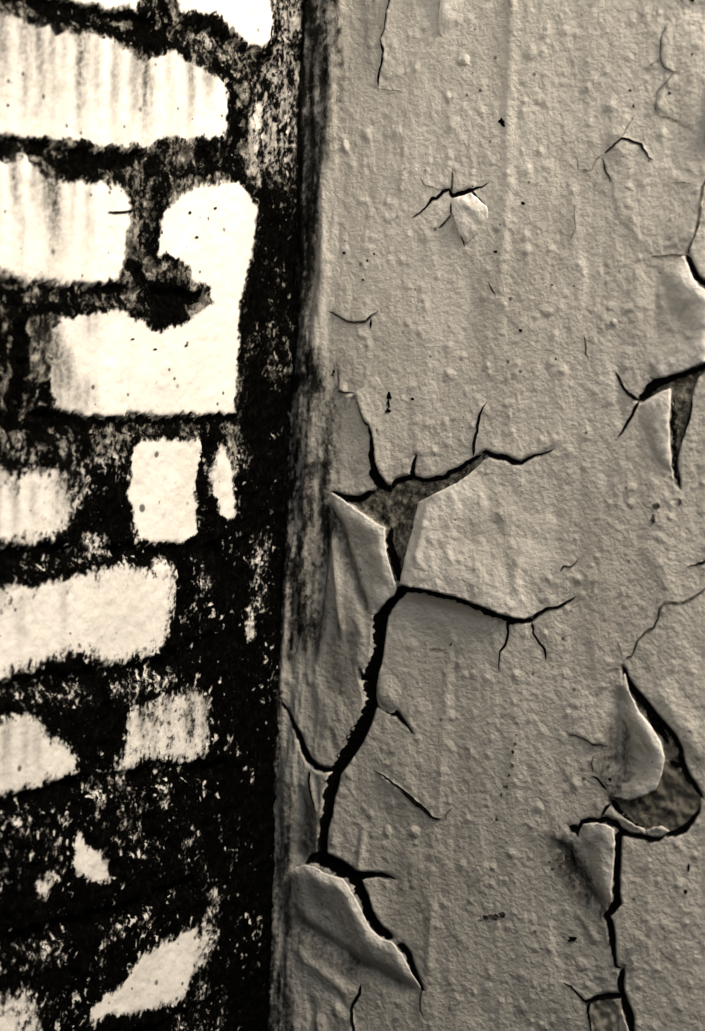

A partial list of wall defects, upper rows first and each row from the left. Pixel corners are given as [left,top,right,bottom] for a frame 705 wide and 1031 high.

crack [377,0,403,92]
crack [577,24,682,184]
peeling [452,193,488,244]
crack [651,181,705,286]
crack [330,377,555,502]
peeling [637,256,705,506]
peeling [330,453,576,619]
crack [281,526,576,1017]
crack [562,560,705,1031]
peeling [578,666,701,912]
peeling [289,865,421,991]
peeling [590,1000,629,1031]